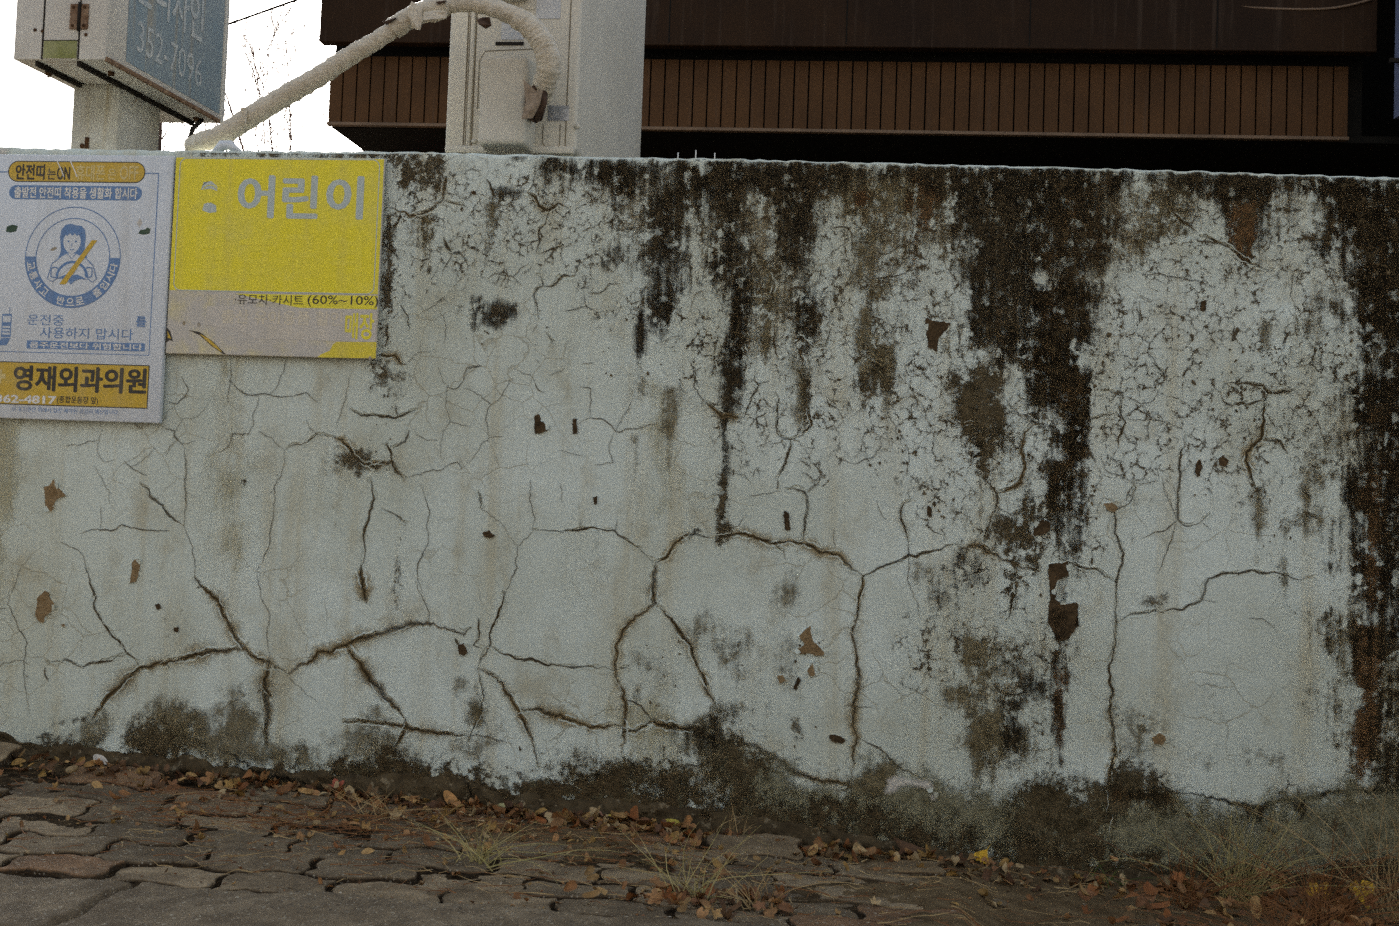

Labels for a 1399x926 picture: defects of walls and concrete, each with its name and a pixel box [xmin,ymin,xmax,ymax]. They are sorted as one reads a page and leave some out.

water stain [460,297,518,330]
peeling [924,318,952,354]
peeling [1175,253,1267,467]
peeling [43,477,67,514]
crack [0,154,1399,844]
water stain [542,157,1399,866]
peeling [913,481,1093,647]
peeling [32,589,65,628]
peeling [776,625,828,690]
water stain [52,689,418,779]
water stain [453,678,491,759]
peeling [815,709,846,744]